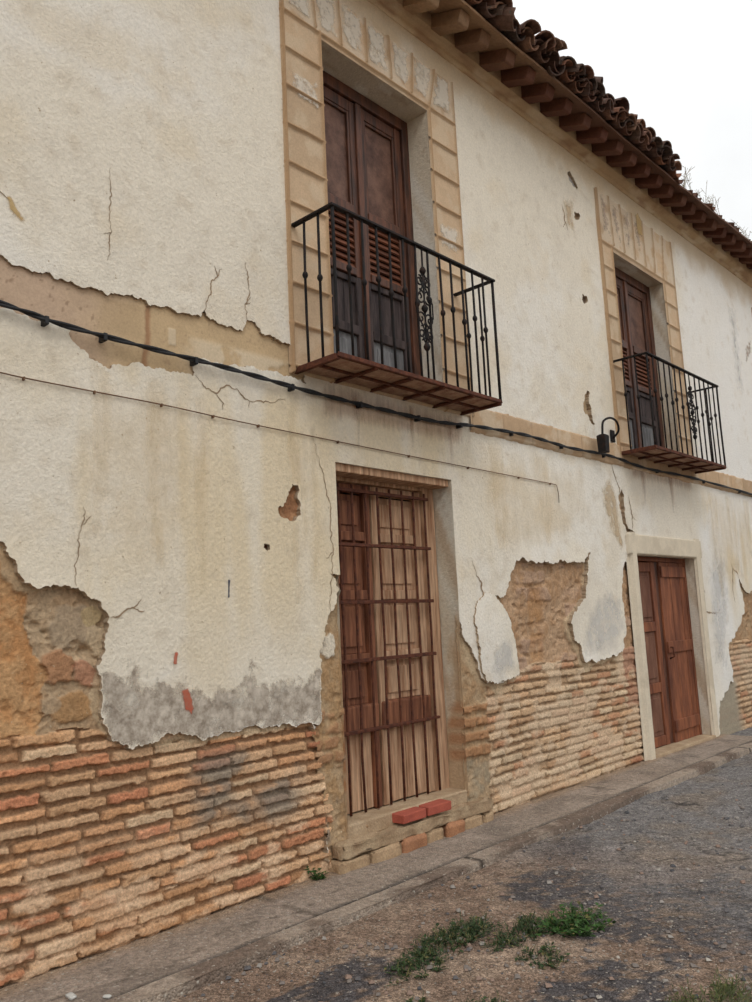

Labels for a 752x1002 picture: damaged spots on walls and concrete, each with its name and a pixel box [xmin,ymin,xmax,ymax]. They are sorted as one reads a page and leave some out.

crack [104,169,112,256]
flaking render [0,256,302,381]
crack [244,262,252,317]
crack [195,375,283,408]
crack [74,506,91,583]
spalling [278,486,298,521]
peeling [605,485,630,545]
crack [110,600,144,618]
spalling [455,560,644,813]
spalling [719,587,752,735]
spalling [0,542,347,986]